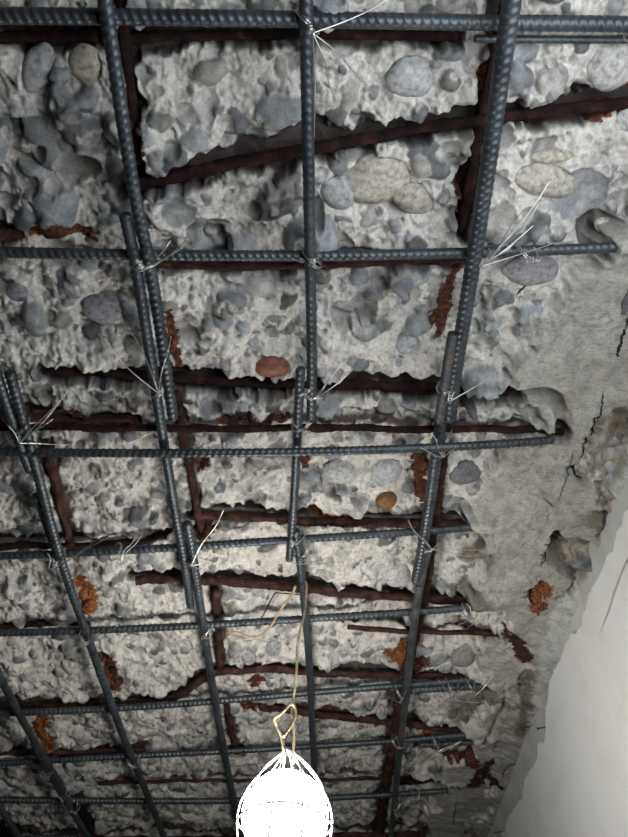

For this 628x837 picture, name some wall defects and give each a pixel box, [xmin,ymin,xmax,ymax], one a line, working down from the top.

spalling [0,25,139,249]
spalling [119,26,304,251]
spalling [313,28,492,142]
spalling [505,31,628,110]
rust [155,261,305,271]
rust [27,309,439,542]
spalling [0,127,517,837]
rust [316,258,466,337]
spalling [444,109,628,449]
crack [616,318,628,357]
rust [0,424,565,837]
flaking render [501,407,628,837]